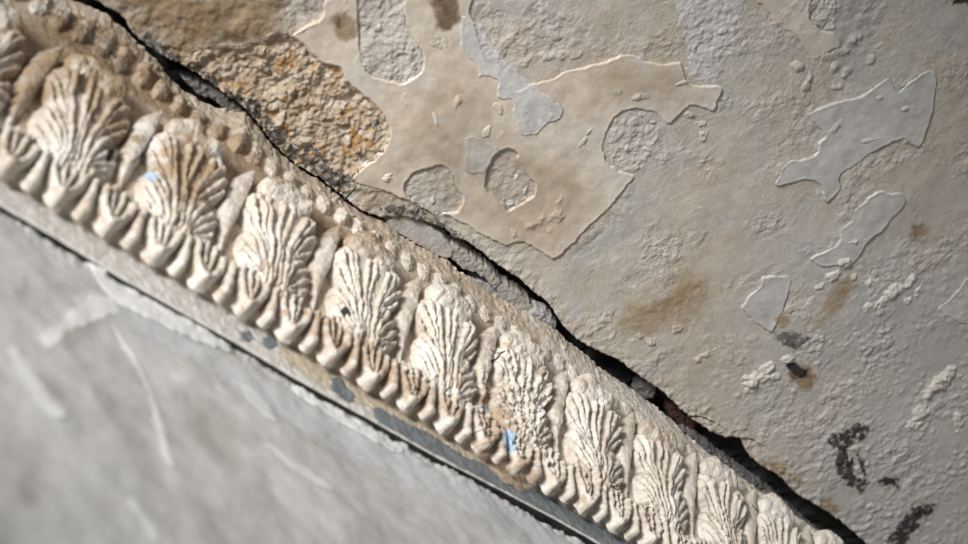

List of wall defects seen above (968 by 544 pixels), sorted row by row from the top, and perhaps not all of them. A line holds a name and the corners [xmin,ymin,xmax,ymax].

crack [73,0,499,298]
peeling [162,0,841,258]
peeling [775,70,937,203]
peeling [810,190,906,267]
crack [0,207,596,544]
crack [449,235,866,544]
peeling [741,275,791,332]
leakage [774,331,810,352]
corrosion [790,365,817,388]
leakage [828,423,899,494]
leakage [887,503,936,544]